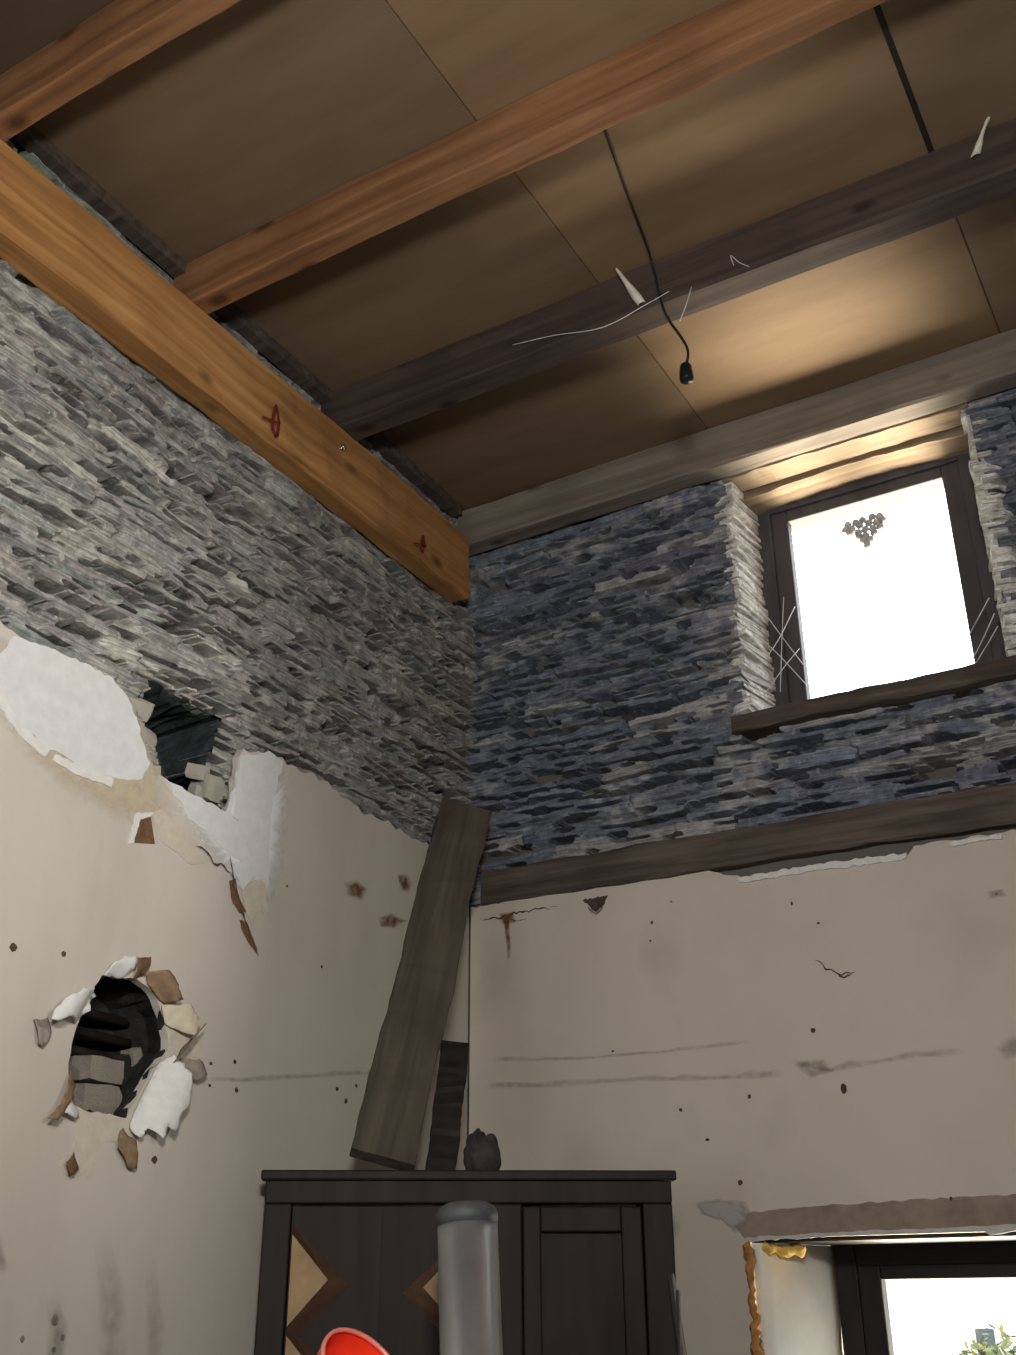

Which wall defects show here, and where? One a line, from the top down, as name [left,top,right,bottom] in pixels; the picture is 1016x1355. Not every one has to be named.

flaking render [0,636,225,865]
spalling [34,955,213,1178]
flaking render [735,1194,1016,1242]